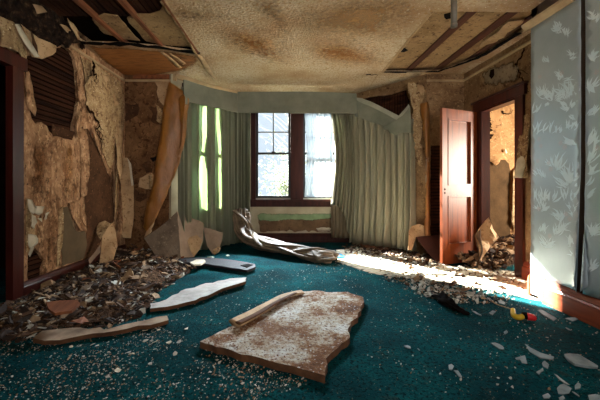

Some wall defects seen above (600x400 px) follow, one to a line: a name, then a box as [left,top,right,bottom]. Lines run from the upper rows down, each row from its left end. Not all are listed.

peeling [86,42,217,81]
damp [316,45,371,63]
peeling [25,71,37,116]
peeling [52,109,82,140]
crack [86,105,104,140]
peeling [408,82,425,167]
flaking render [490,149,514,237]
peeling [25,198,49,257]
flaking render [57,200,88,266]